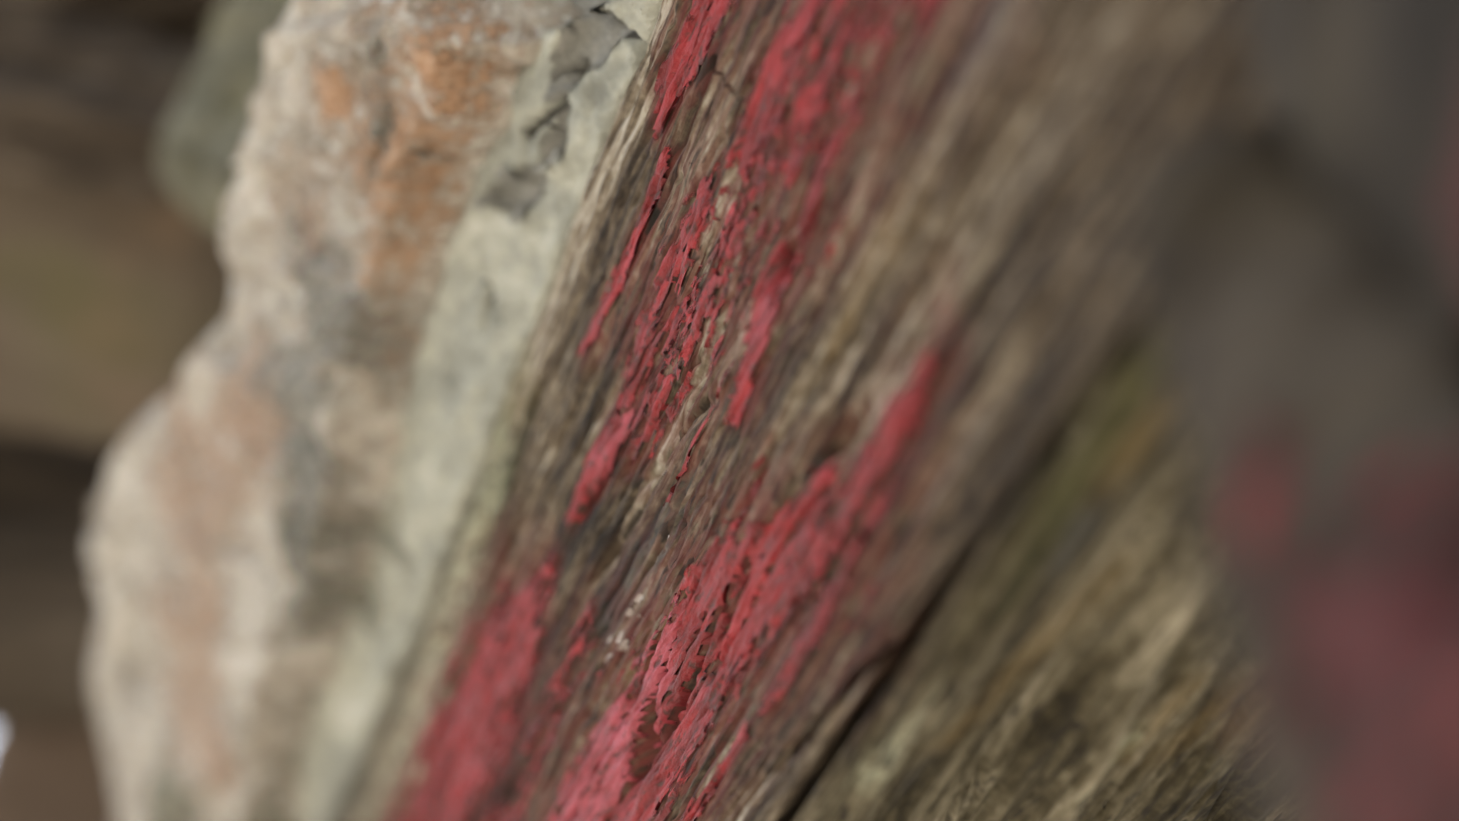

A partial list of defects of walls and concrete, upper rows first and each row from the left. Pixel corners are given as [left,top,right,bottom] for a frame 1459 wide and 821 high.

spalling [474,2,633,225]
peeling [564,0,941,525]
peeling [382,337,934,821]